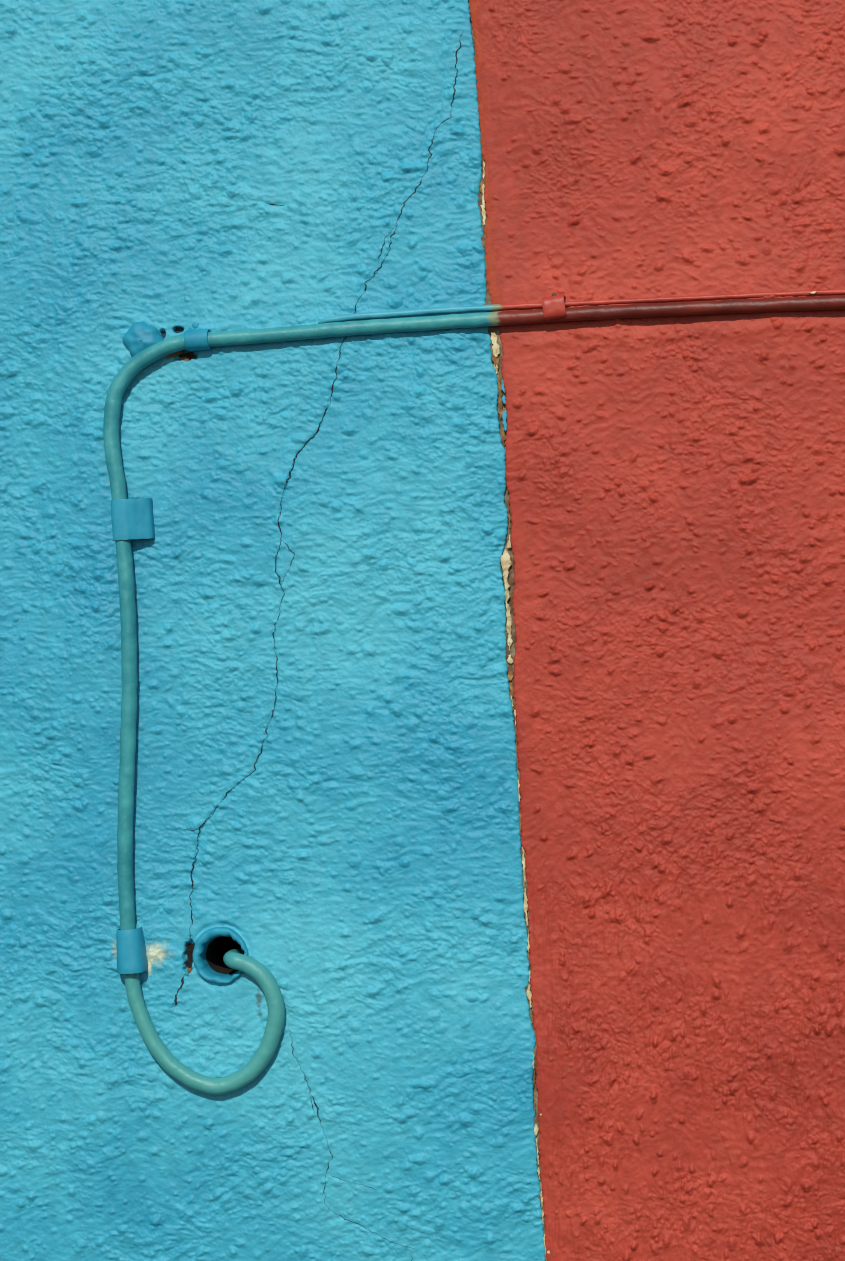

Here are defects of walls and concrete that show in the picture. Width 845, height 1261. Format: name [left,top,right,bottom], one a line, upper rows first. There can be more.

peeling [479,161,487,225]
peeling [490,332,507,446]
crack [185,31,464,940]
peeling [501,508,530,953]
crack [174,976,184,1006]
peeling [526,971,534,1024]
crack [291,1042,417,1261]